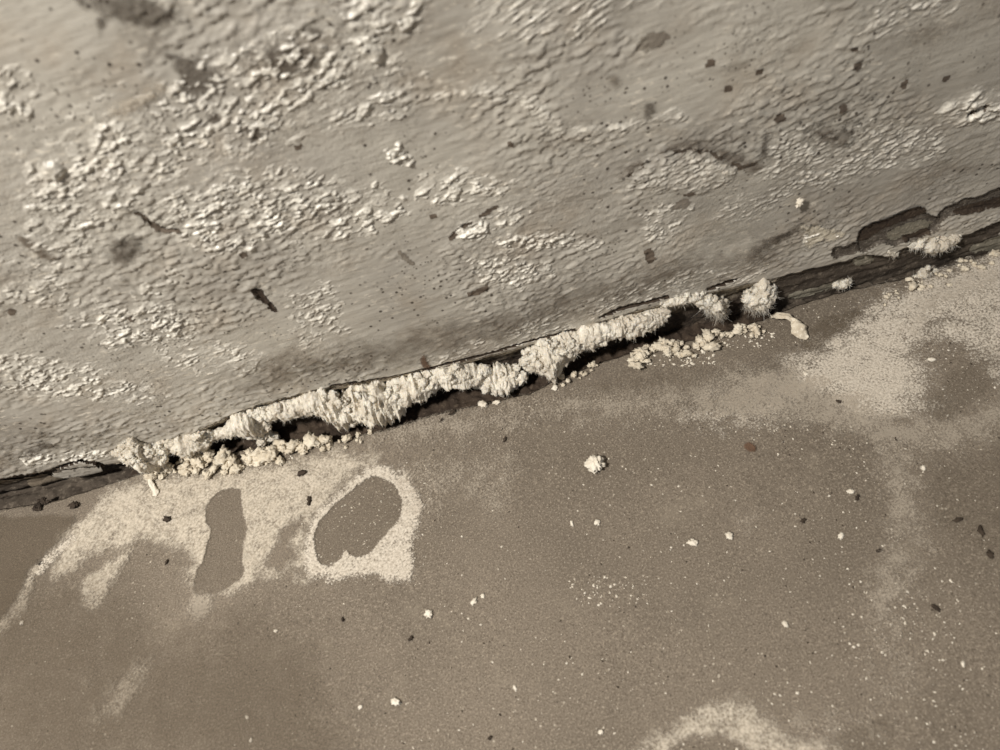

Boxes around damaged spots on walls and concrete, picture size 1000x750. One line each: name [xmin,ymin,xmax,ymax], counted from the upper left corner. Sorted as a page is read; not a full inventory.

crack [397,250,415,266]
spalling [766,188,1000,340]
crack [707,279,737,291]
crack [598,295,669,318]
crack [329,329,575,387]
water stain [0,278,782,632]
crack [0,459,130,497]